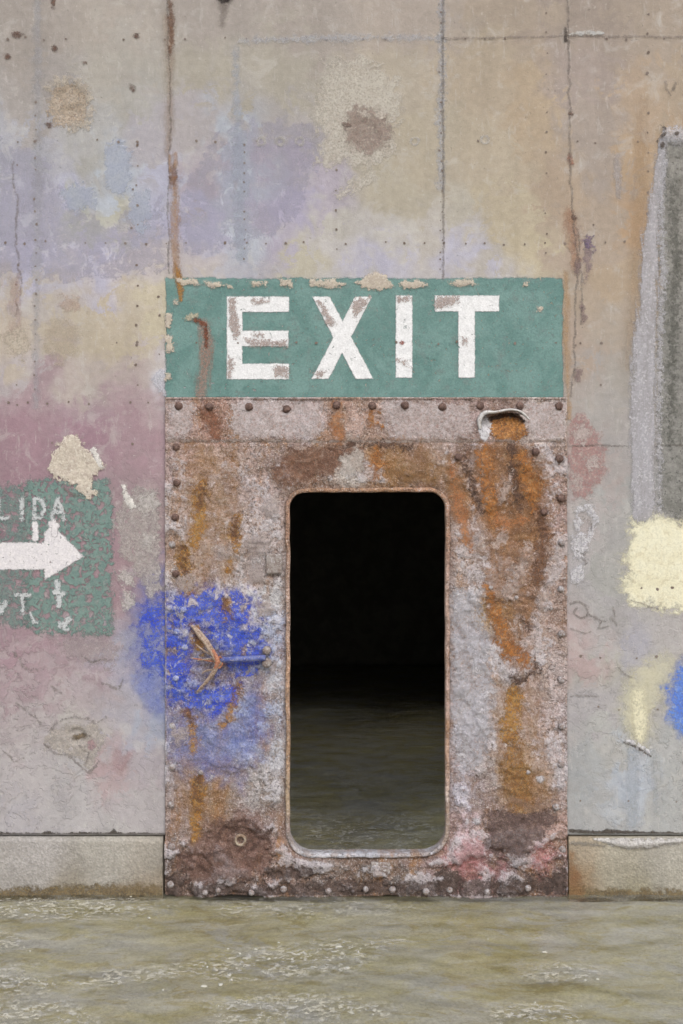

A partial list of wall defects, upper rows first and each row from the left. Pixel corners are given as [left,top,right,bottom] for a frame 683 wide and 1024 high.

spalling [312,54,406,200]
rust [168,154,184,301]
rust [185,312,223,441]
peeling [176,277,293,349]
peeling [309,271,428,319]
peeling [434,277,479,310]
leakage [629,125,683,523]
peeling [47,434,105,500]
rust [174,477,211,596]
rust [225,513,243,574]
rust [271,399,557,862]
rust [166,771,567,897]